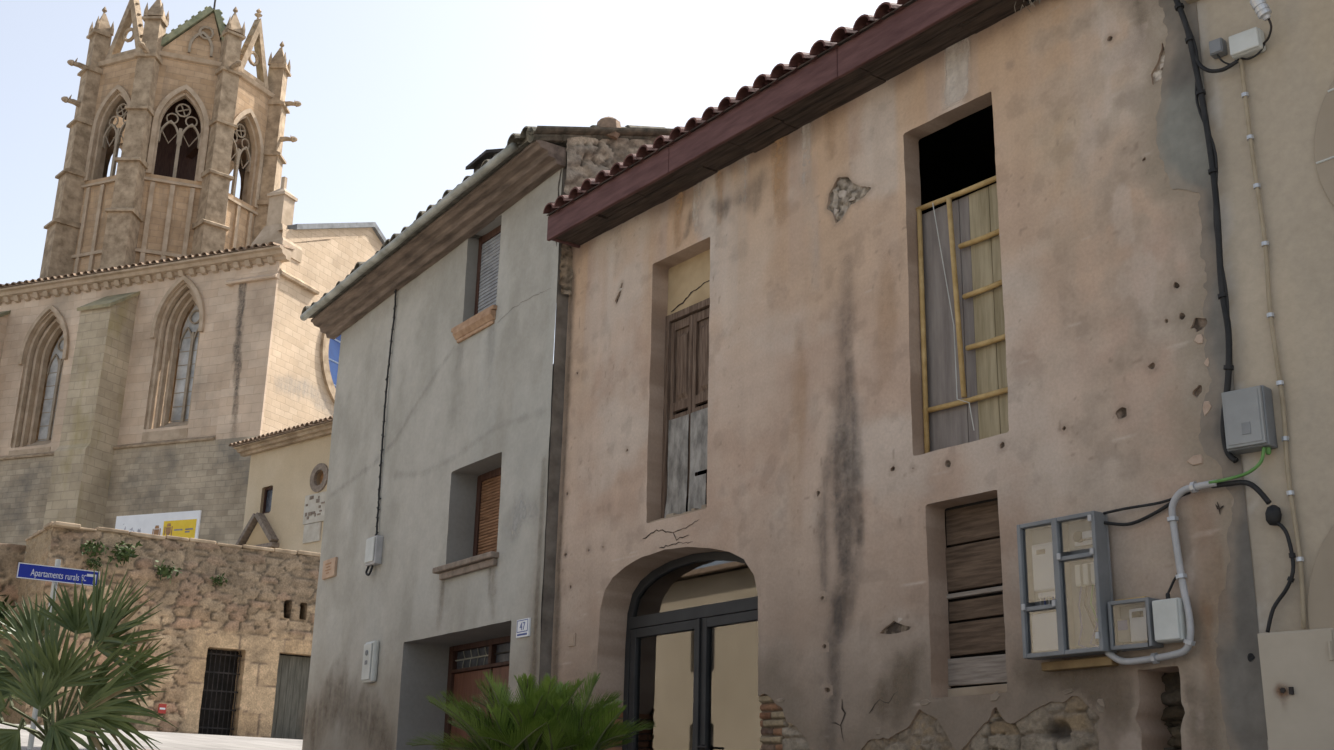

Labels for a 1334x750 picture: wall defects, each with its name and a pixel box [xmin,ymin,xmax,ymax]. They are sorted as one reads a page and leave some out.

flaking render [828,178,871,222]
crack [671,280,710,312]
crack [643,520,698,548]
water stain [835,479,852,601]
flaking render [882,618,911,634]
flaking render [759,694,811,750]
flaking render [862,688,1106,750]